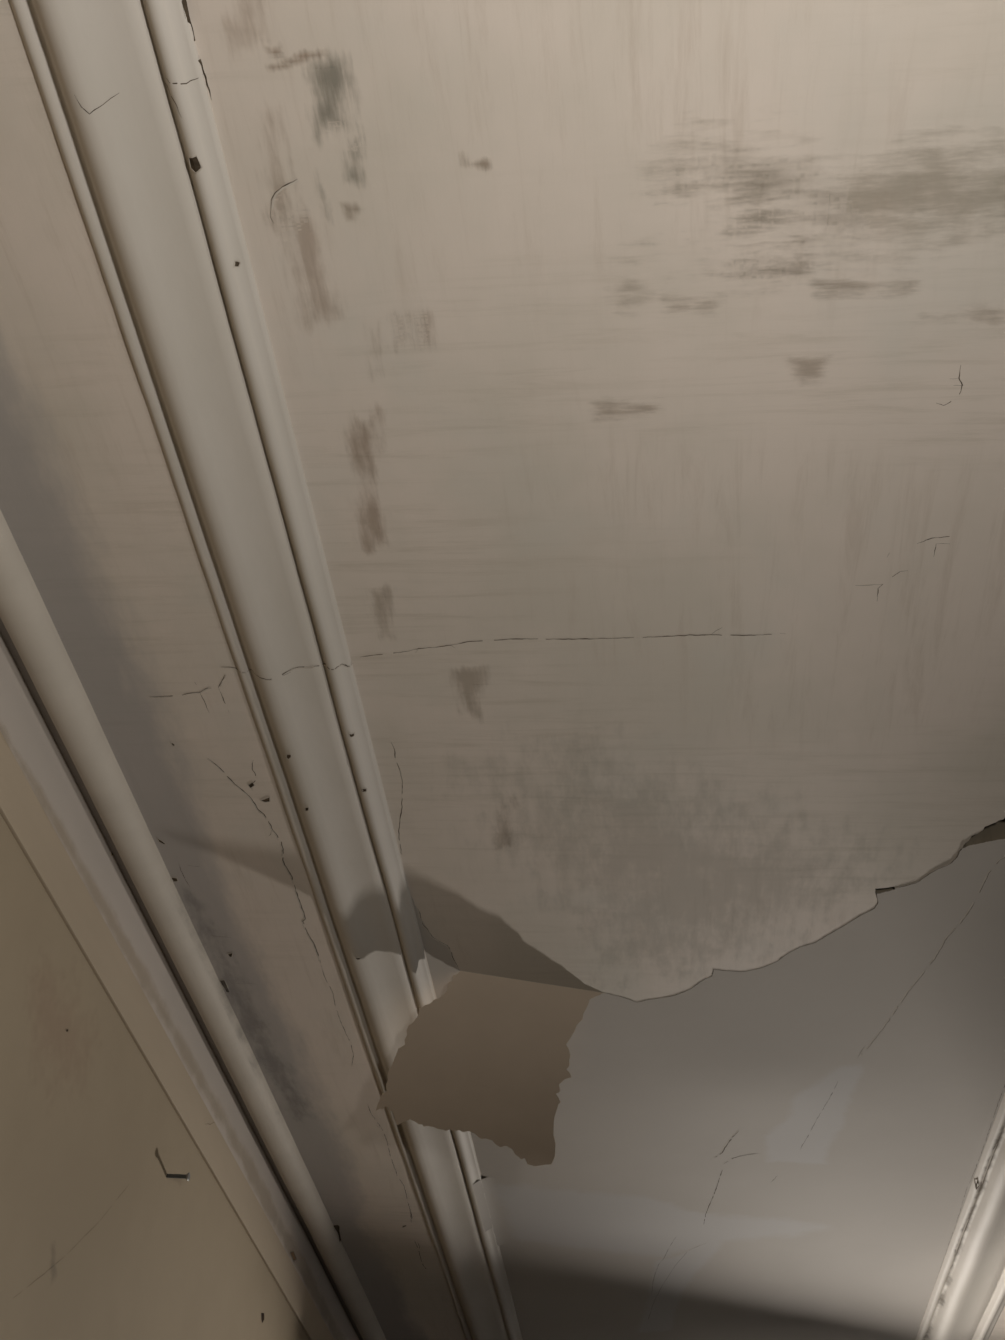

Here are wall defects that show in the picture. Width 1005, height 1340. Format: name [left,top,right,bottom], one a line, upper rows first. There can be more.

crack [150,639,507,712]
peeling [376,971,602,1167]